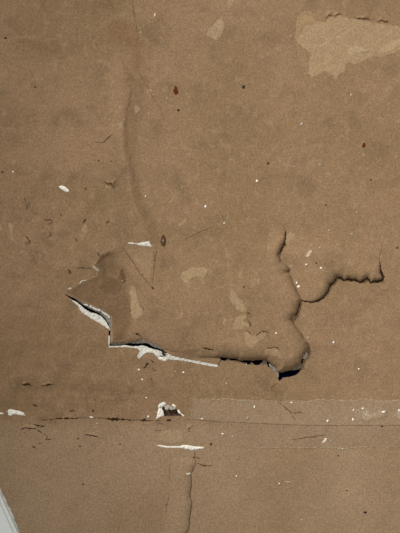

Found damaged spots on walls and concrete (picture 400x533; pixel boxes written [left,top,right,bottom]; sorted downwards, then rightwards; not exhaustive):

peeling [295,10,400,83]
peeling [129,286,144,320]
peeling [229,290,268,350]